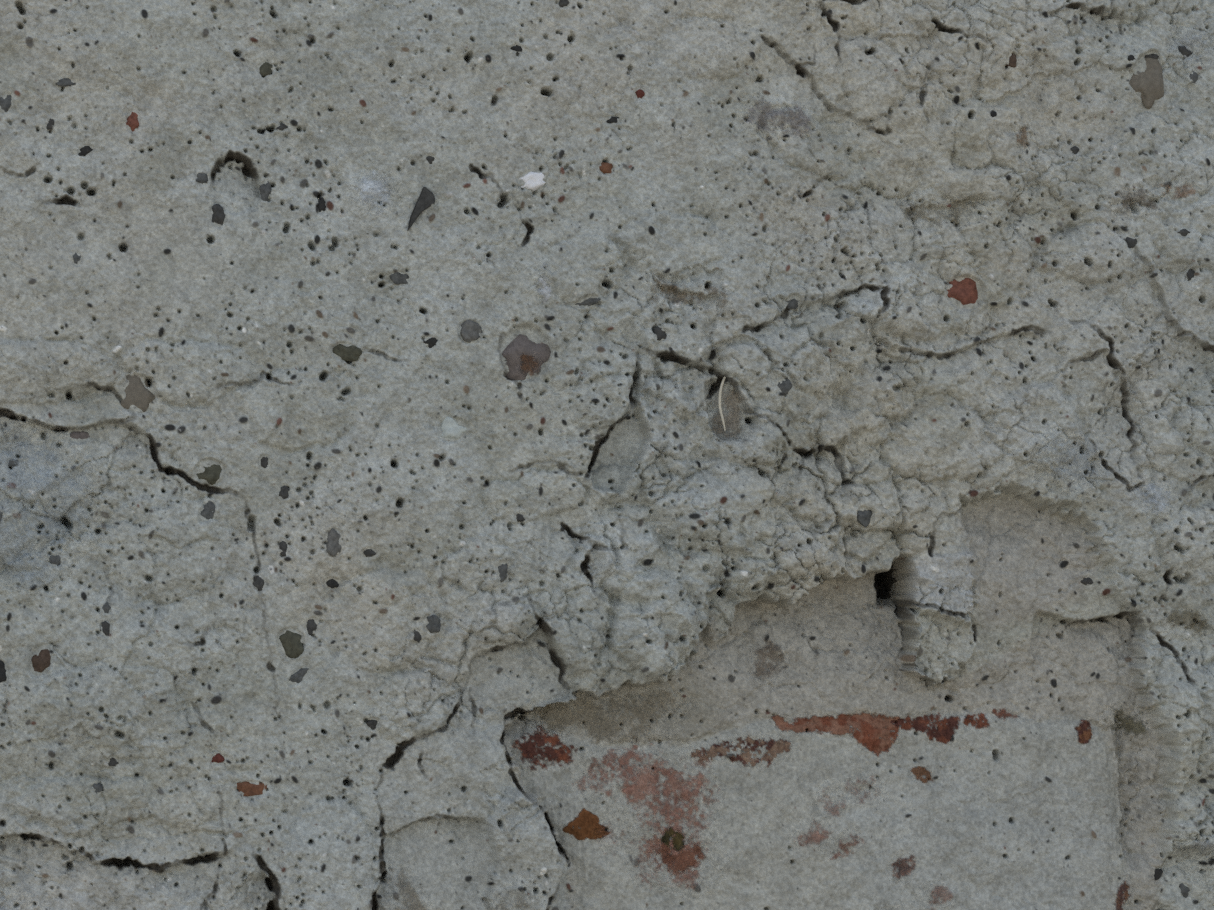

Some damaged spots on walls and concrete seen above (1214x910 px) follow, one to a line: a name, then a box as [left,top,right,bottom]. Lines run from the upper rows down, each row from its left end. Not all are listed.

crack [742,285,888,332]
crack [511,345,865,488]
crack [899,320,1144,491]
crack [0,383,282,721]
crack [561,512,628,600]
crack [928,510,959,557]
crack [191,702,216,736]
crack [371,595,569,910]
spalling [371,496,1156,910]
crack [0,788,280,910]